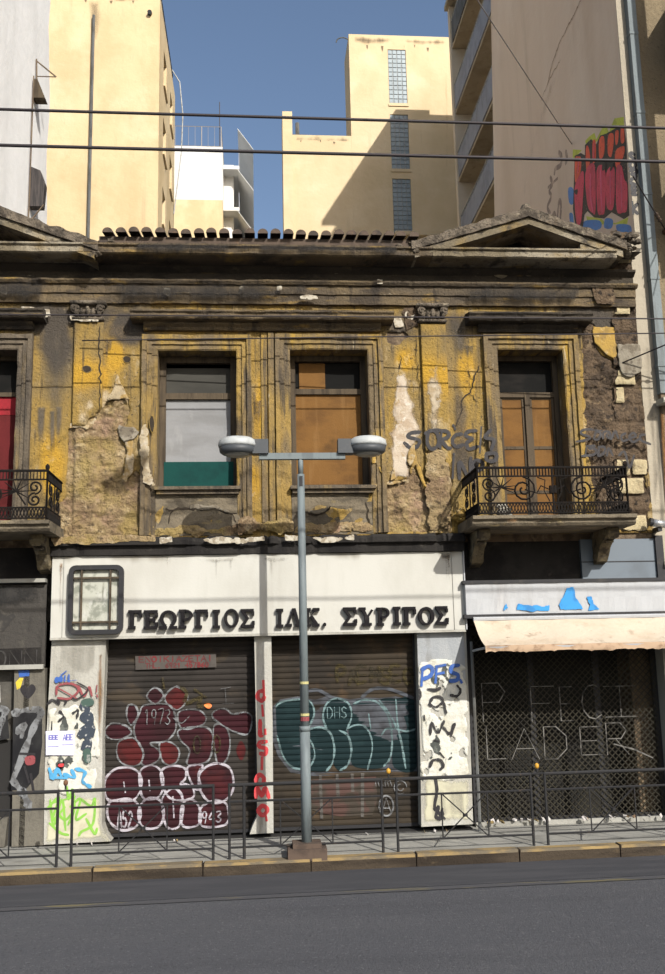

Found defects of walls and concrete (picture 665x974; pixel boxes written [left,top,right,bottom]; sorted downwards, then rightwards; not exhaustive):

peeling [44,374,373,546]
peeling [372,374,466,534]
crack [455,366,479,427]
flaking render [581,288,652,532]
peeling [425,780,468,821]